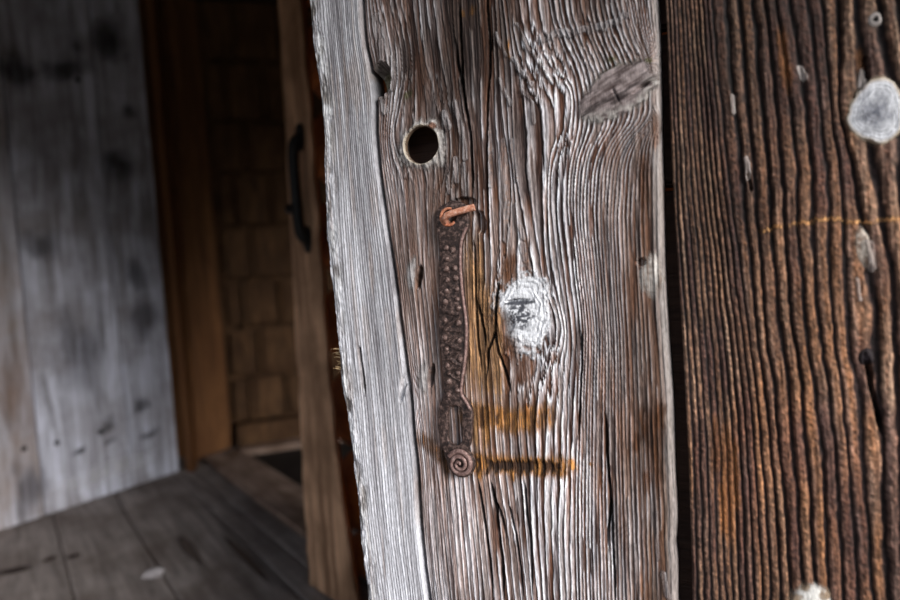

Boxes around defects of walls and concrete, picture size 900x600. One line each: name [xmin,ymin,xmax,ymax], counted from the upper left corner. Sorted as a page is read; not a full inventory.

crack [456,0,512,395]
rust [467,227,576,482]